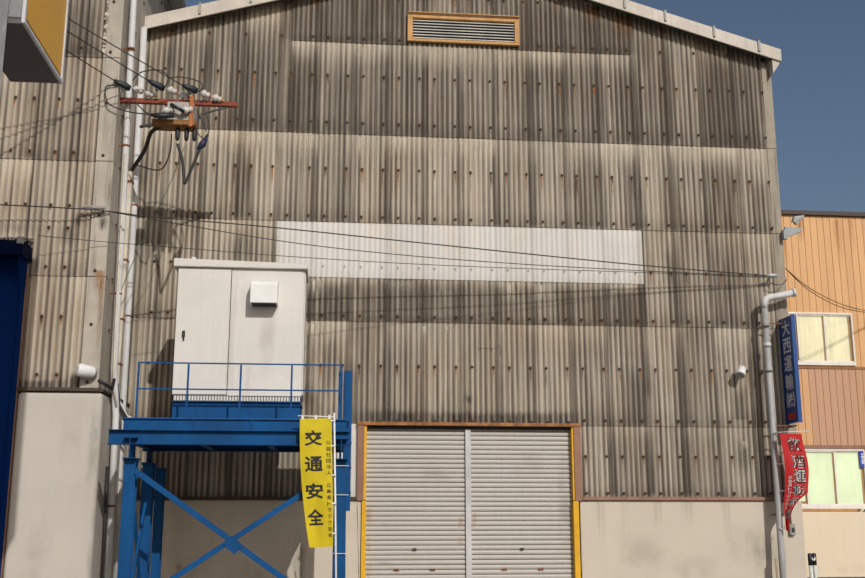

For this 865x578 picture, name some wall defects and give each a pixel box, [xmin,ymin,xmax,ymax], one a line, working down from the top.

damp [452,48,482,62]
damp [235,56,268,144]
damp [393,137,406,149]
damp [235,166,249,217]
damp [624,173,642,227]